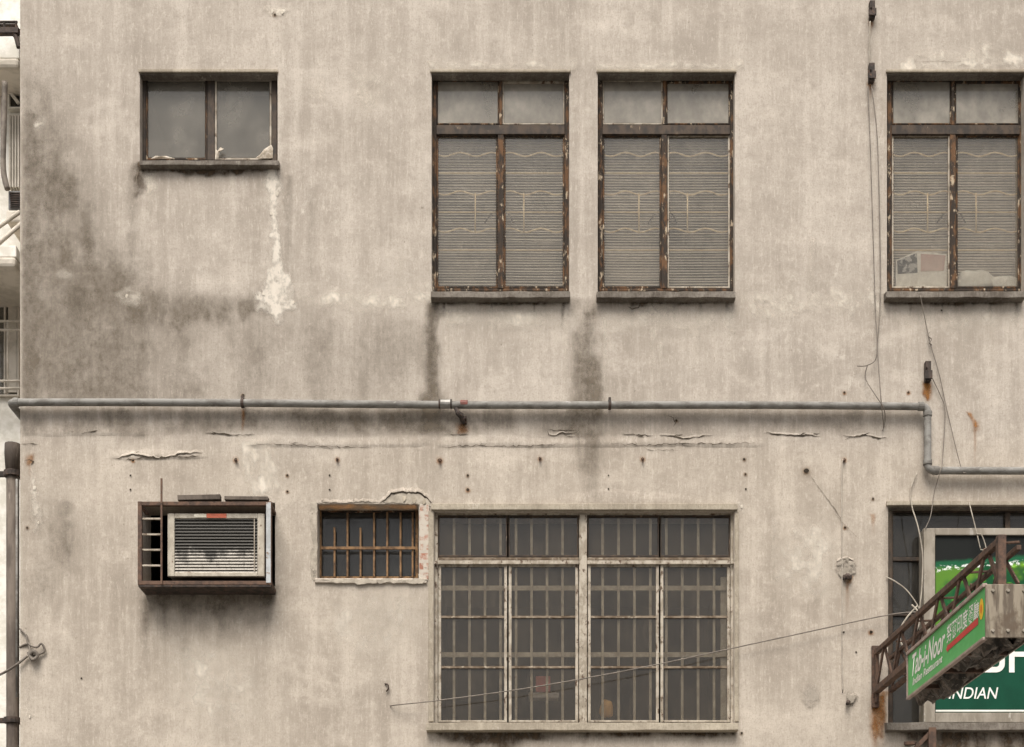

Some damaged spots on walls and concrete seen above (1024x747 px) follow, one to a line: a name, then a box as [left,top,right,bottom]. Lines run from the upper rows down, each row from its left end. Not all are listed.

damp [25,156,78,218]
damp [135,162,263,193]
peeling [255,170,296,324]
damp [23,231,254,398]
damp [479,303,547,326]
damp [292,283,470,432]
damp [569,344,602,456]
crack [116,431,371,460]
crack [445,429,577,448]
crack [616,416,887,451]
flaking render [310,487,432,585]
corrosion [872,691,885,738]